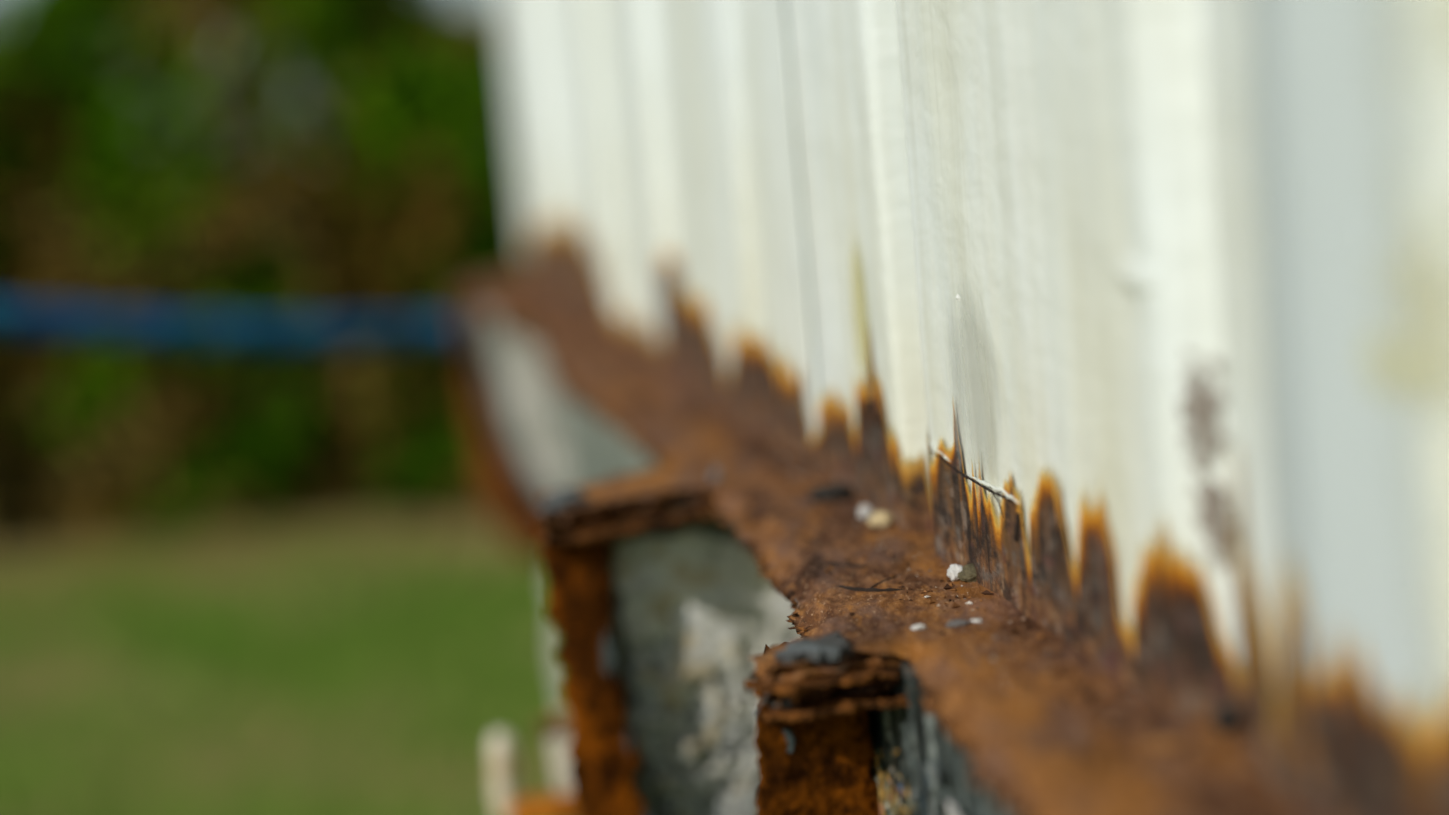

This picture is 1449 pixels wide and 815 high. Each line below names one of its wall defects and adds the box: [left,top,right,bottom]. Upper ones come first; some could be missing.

corrosion [522,200,1449,815]
peeling [611,527,800,815]
peeling [911,764,960,815]